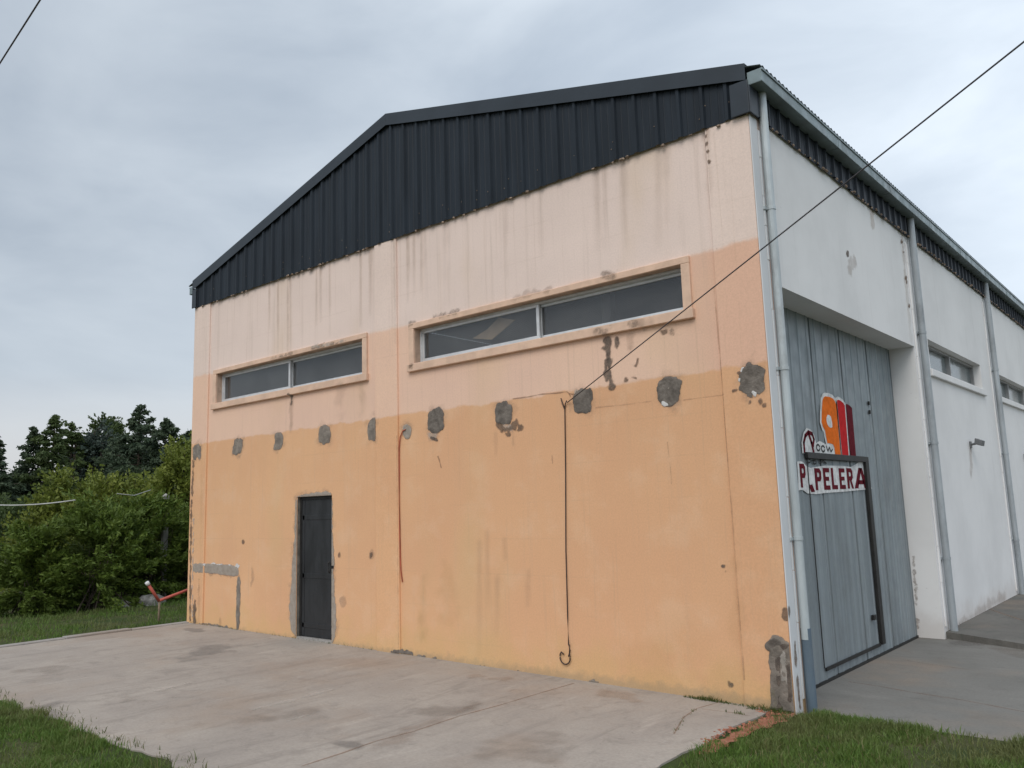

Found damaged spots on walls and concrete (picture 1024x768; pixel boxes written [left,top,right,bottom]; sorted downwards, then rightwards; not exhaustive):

peeling [189,461,240,628]
spalling [765,635,801,713]